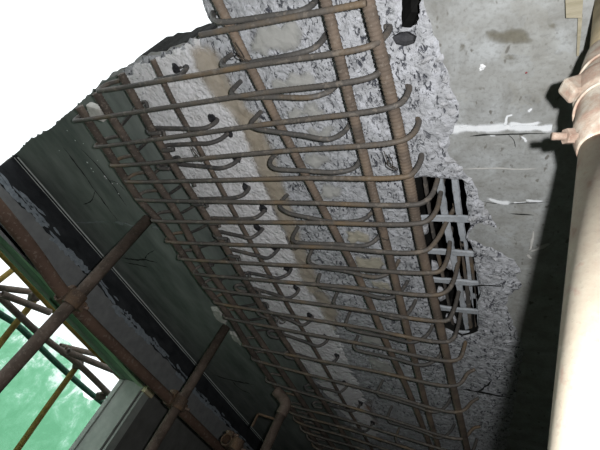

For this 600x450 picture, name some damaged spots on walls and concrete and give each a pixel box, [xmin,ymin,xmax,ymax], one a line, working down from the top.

leakage [489,31,527,42]
peeling [0,157,103,275]
spalling [75,92,336,450]
corrosion [194,49,336,325]
spalling [117,0,525,450]